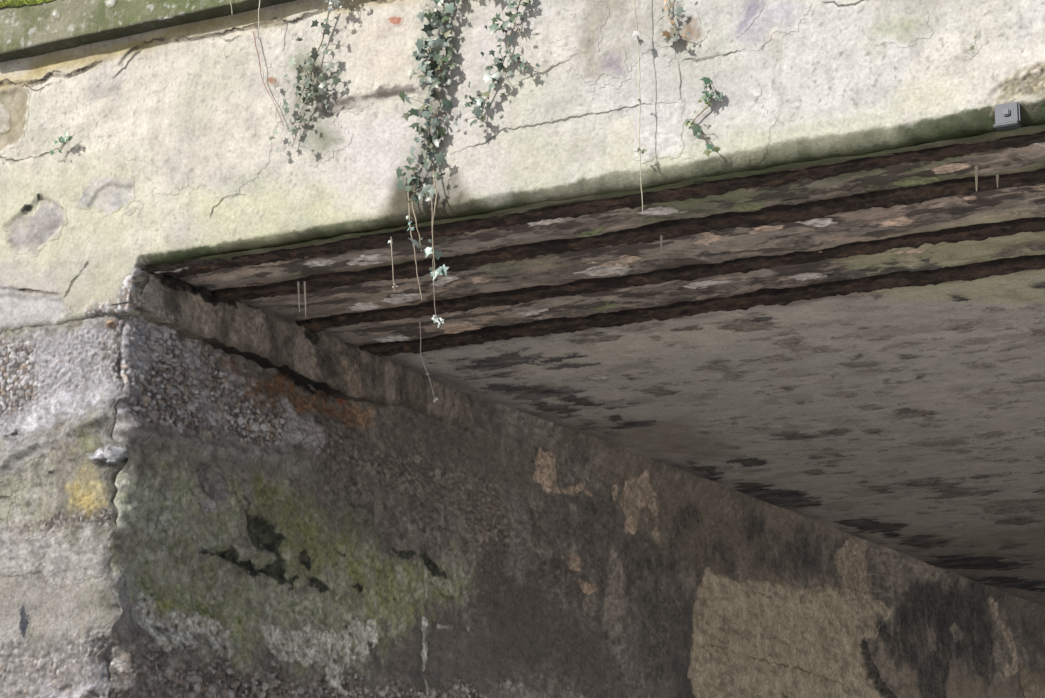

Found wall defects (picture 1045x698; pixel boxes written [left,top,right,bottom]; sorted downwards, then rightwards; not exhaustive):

crack [824,0,862,8]
crack [0,8,321,93]
spalling [317,81,426,118]
crack [449,50,741,154]
spalling [4,173,143,257]
peeling [637,163,974,220]
peeling [748,195,994,250]
peeling [347,232,741,311]
peeling [431,279,741,334]
rust [209,346,377,437]
peeling [419,312,881,436]
leakage [502,461,1045,698]